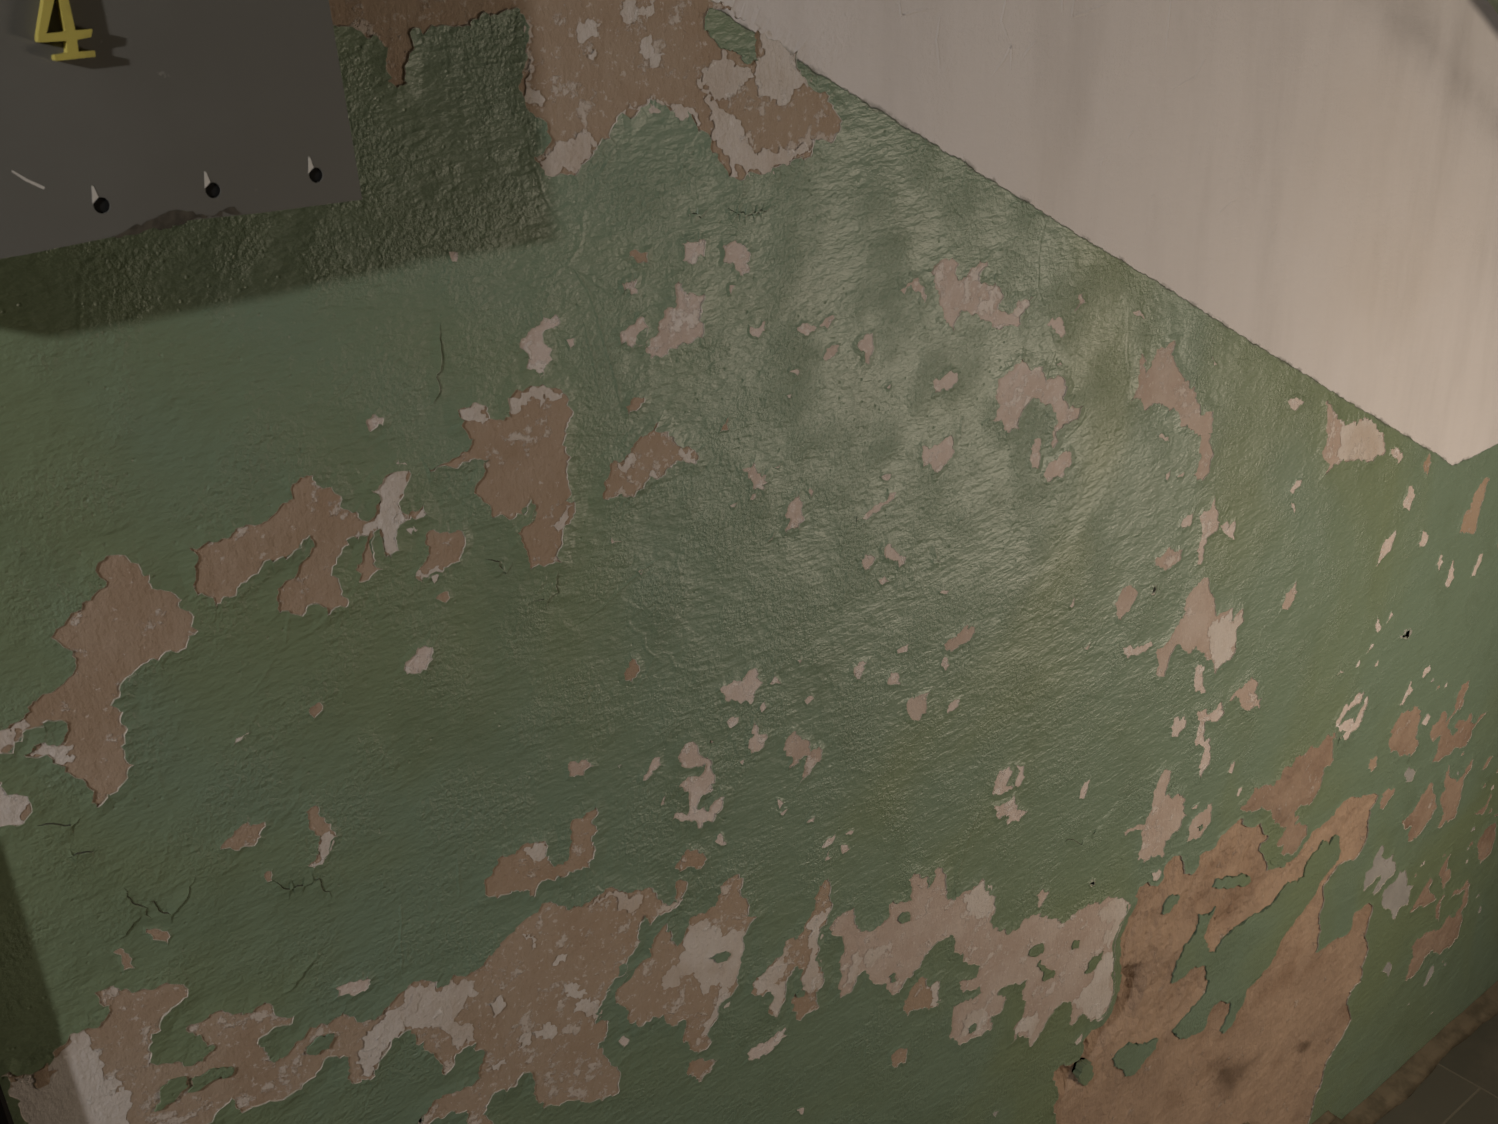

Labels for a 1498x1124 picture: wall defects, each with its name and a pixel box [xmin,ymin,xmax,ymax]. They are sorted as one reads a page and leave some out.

peeling [329,0,854,197]
peeling [613,215,756,374]
peeling [895,243,1090,486]
peeling [0,306,1498,1124]